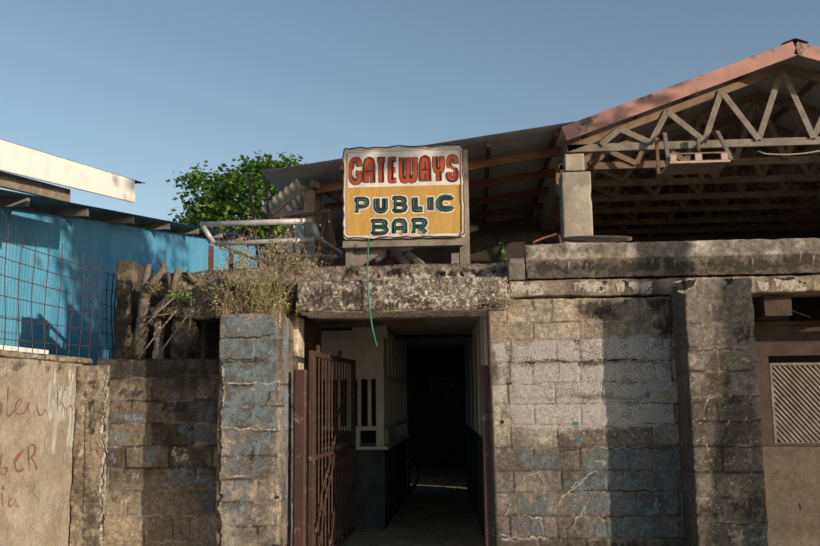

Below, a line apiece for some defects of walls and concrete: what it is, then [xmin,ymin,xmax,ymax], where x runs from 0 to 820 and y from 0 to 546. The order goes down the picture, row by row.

peeling [510,281,544,296]
peeling [574,280,652,294]
spalling [674,277,733,294]
peeling [757,277,806,292]
damp [579,299,616,318]
damp [647,298,674,338]
crack [554,446,674,532]